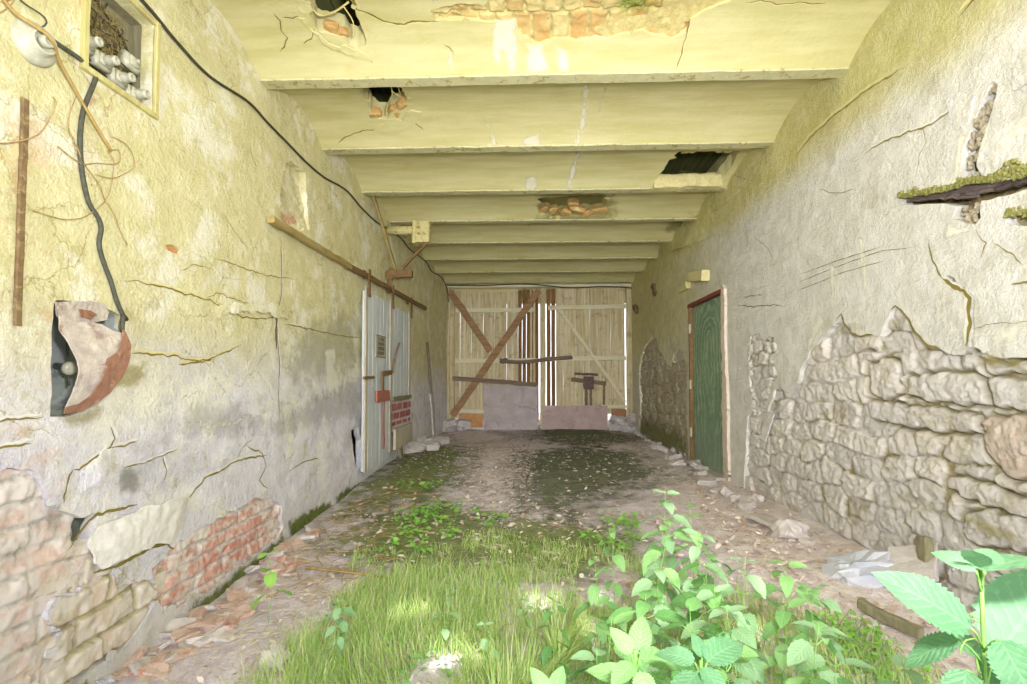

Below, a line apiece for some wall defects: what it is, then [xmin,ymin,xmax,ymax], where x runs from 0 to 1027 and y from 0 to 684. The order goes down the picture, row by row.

flaking render [432,0,725,44]
spalling [352,88,411,118]
crack [864,91,959,175]
spalling [536,194,612,219]
crack [125,215,360,428]
crack [892,239,1027,350]
flaking render [638,334,688,458]
crack [63,423,318,502]
flaking render [745,308,1027,612]
crack [69,504,137,549]
crack [94,542,175,573]
flaking render [0,468,281,684]